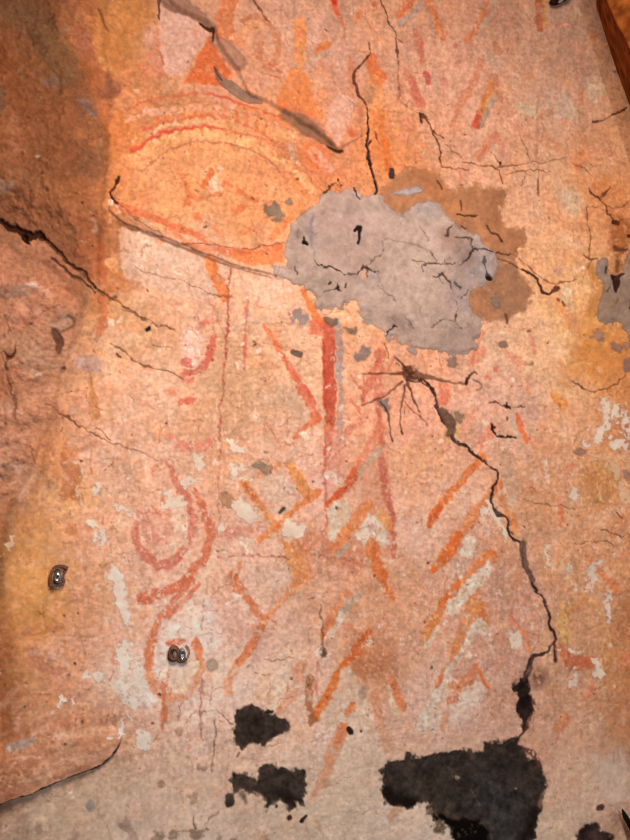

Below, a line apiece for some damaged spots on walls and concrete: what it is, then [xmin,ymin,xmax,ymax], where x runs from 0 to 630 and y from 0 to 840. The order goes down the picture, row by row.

crack [380,0,551,194]
crack [0,219,174,347]
peeling [391,186,423,196]
damp [380,168,532,324]
crack [412,163,627,329]
crack [4,346,17,419]
crack [116,346,183,379]
crack [362,324,557,659]
damp [233,704,290,757]
damp [225,764,307,823]
damp [379,655,547,840]
damp [576,823,614,840]